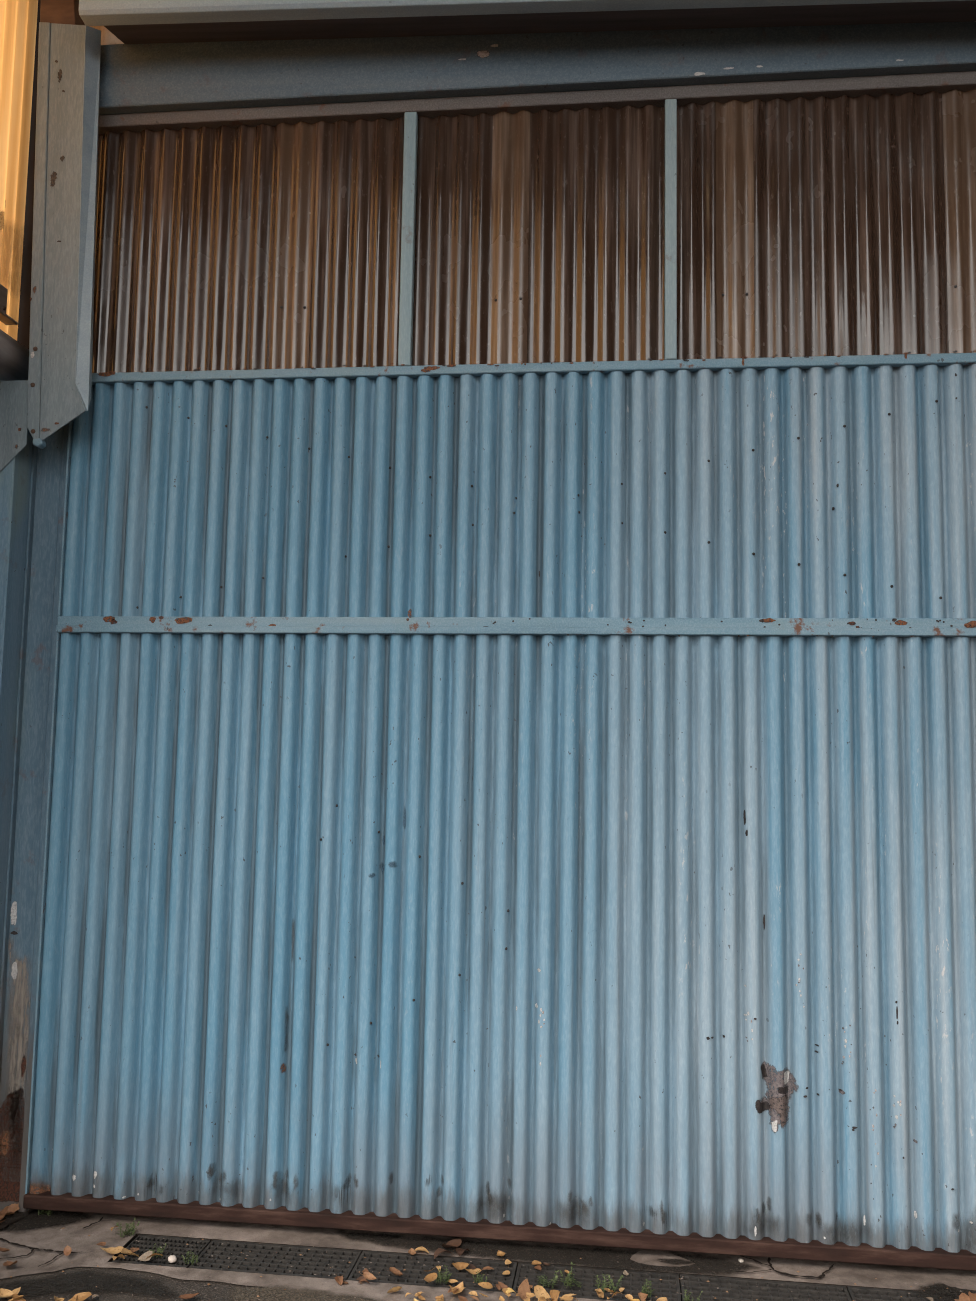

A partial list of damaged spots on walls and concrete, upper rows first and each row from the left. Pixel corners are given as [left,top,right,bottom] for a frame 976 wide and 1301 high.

corrosion [149,616,192,624]
corrosion [0,1056,51,1202]
peeling [755,1062,819,1133]